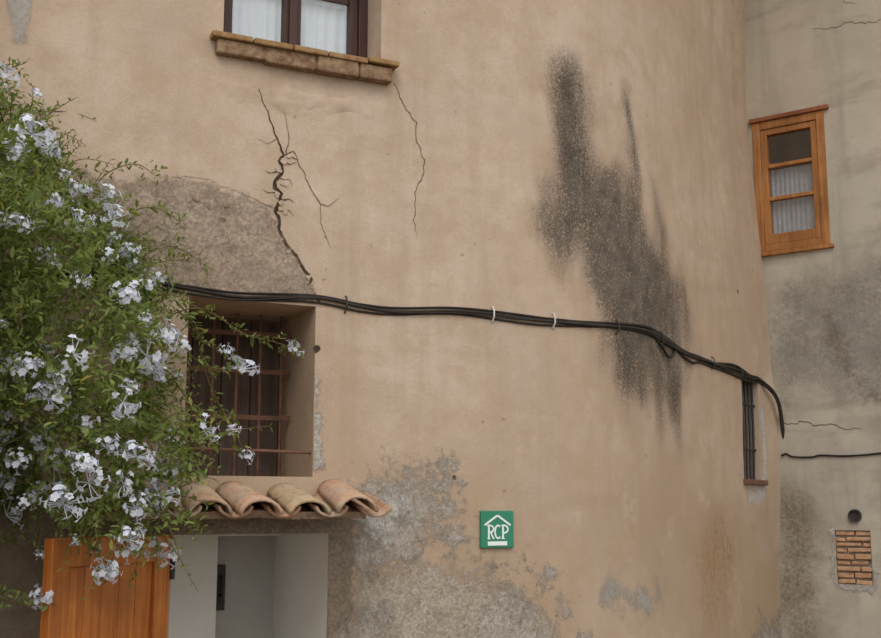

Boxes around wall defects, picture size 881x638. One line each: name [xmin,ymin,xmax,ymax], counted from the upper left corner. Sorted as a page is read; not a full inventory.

spalling [69,169,315,296]
crack [249,91,338,302]
crack [394,84,425,231]
damp [539,64,690,416]
flaking render [336,454,573,638]